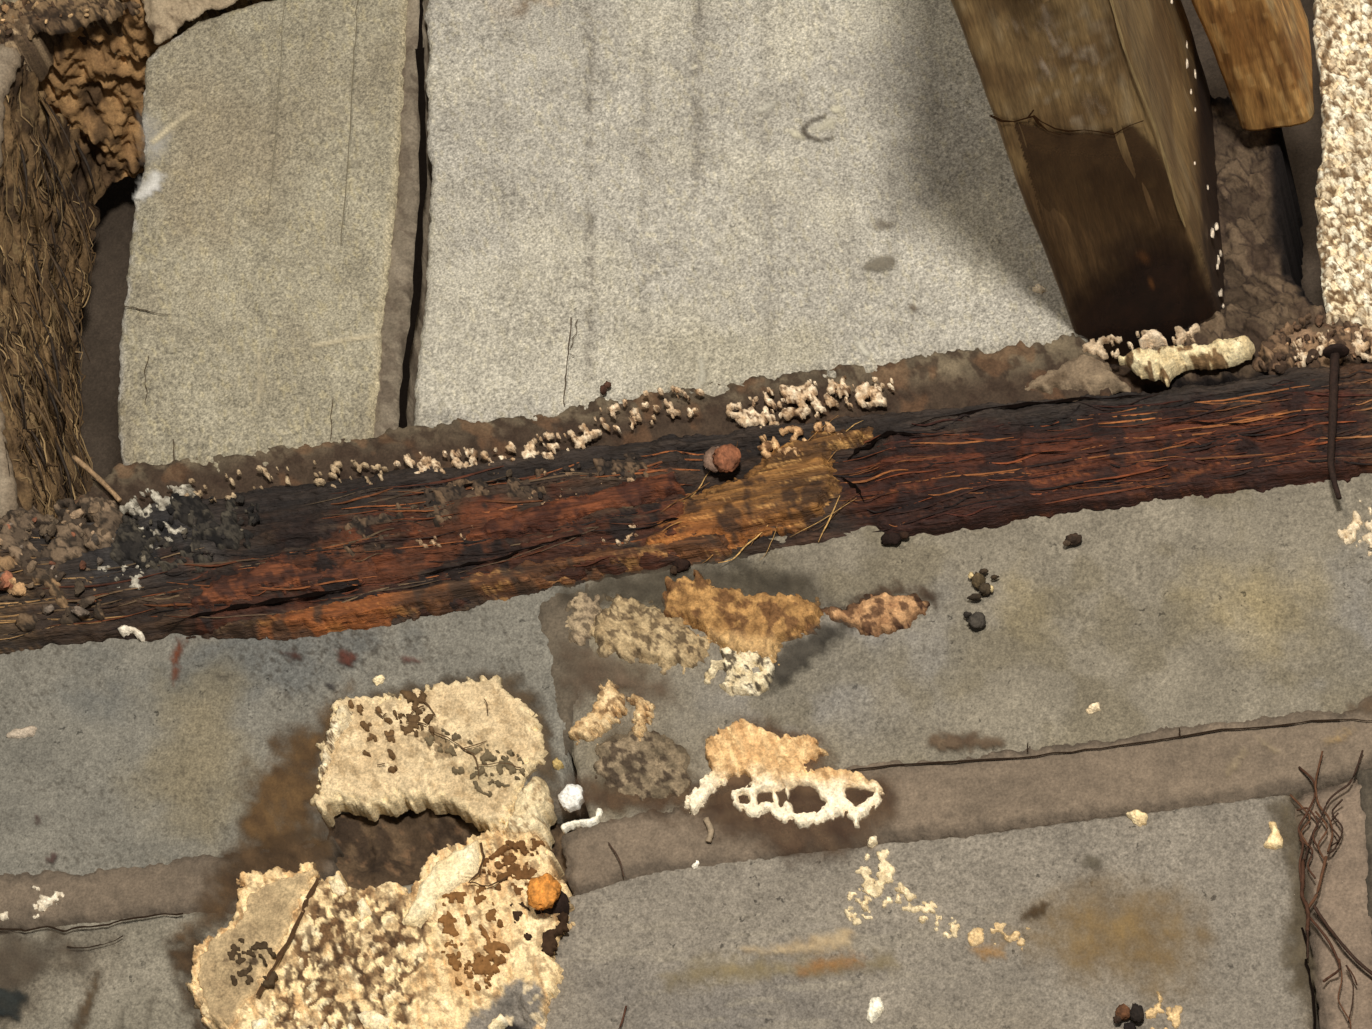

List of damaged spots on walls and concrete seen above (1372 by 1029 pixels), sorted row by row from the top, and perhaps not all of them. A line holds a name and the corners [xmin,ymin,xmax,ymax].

damp [168,708,333,1029]
spalling [185,674,1030,1029]